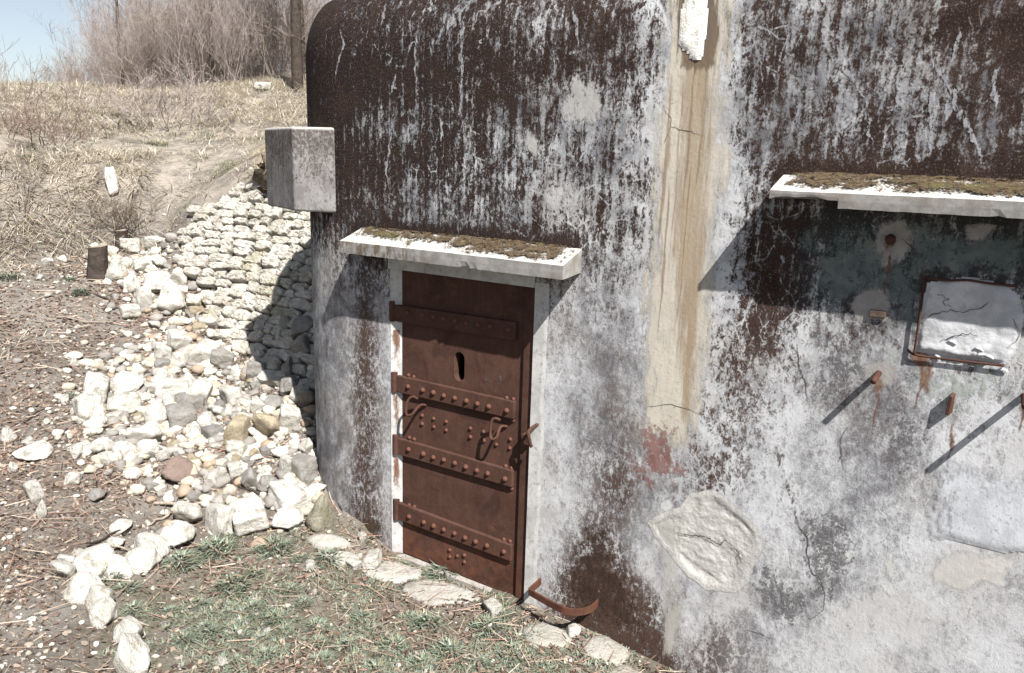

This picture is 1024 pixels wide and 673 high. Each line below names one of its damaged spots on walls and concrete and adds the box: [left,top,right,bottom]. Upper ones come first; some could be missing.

water stain [435,5,465,137]
water stain [533,122,541,171]
water stain [925,32,984,164]
water stain [990,67,1000,107]
rust [911,352,934,403]
crack [795,514,825,619]